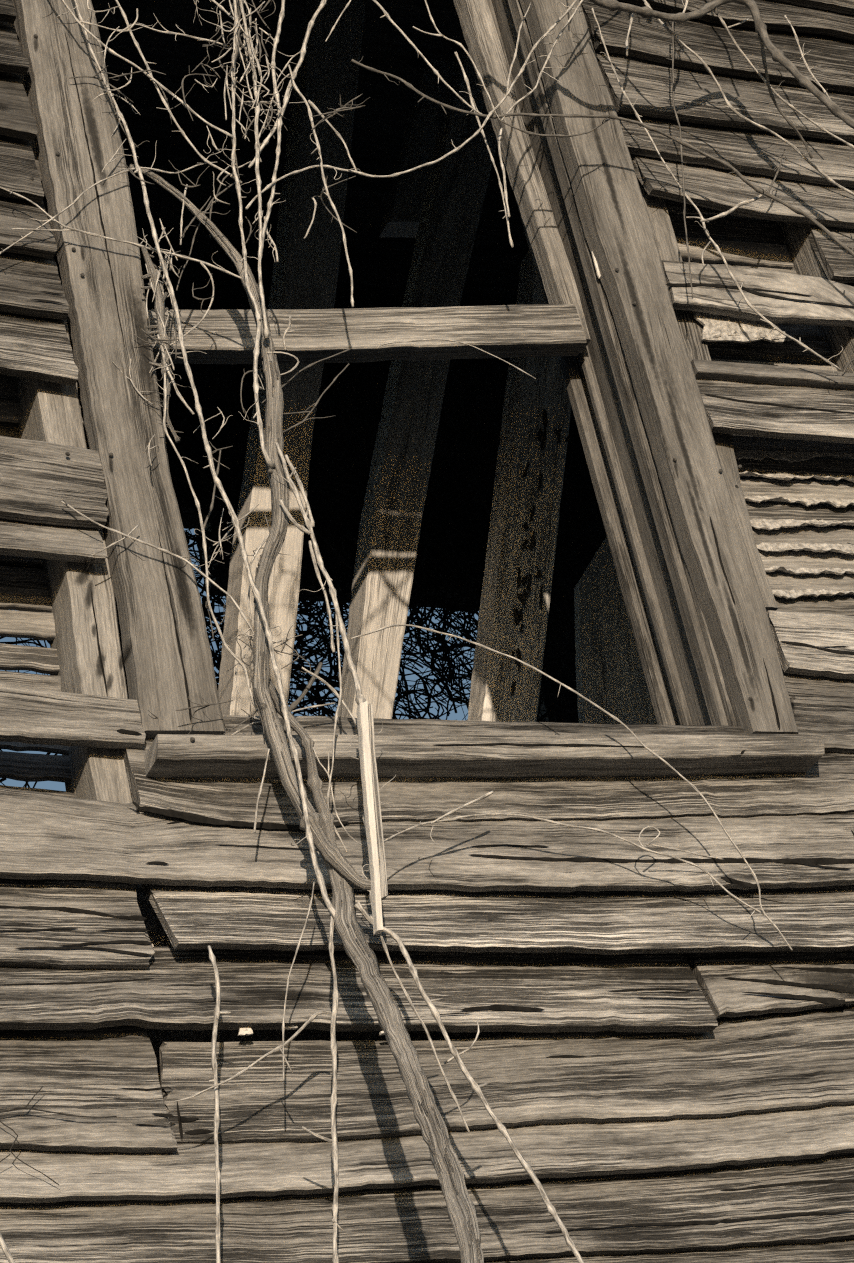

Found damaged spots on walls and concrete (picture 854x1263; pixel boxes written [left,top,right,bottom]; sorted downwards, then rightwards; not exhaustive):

crack [470,830,854,903]